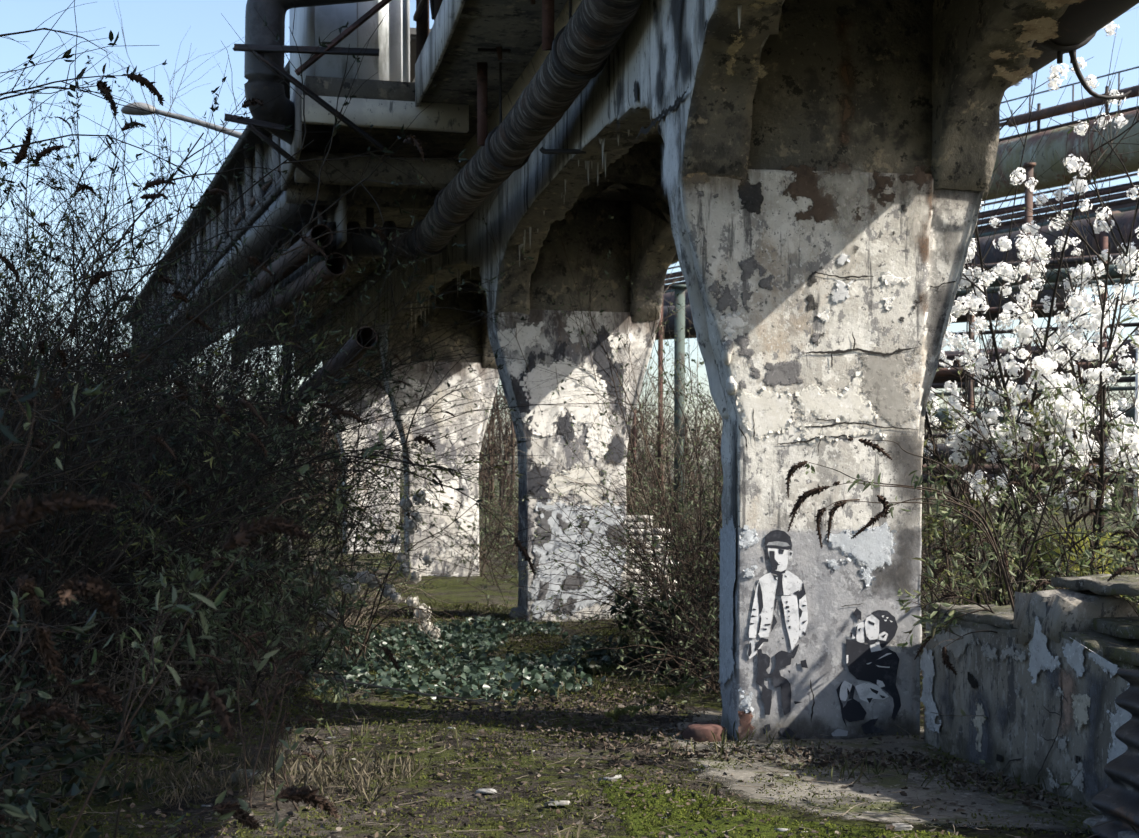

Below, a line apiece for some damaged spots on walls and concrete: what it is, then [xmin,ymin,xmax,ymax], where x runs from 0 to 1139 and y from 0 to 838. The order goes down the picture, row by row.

spalling [989,0,1084,86]
spalling [738,159,764,215]
peeling [837,245,859,266]
peeling [497,321,544,356]
peeling [607,333,634,356]
peeling [705,256,923,447]
crack [804,332,920,366]
peeling [520,358,627,619]
peeling [967,672,986,752]
peeling [920,616,1135,733]
peeling [1056,687,1091,753]
peeling [1106,683,1132,763]